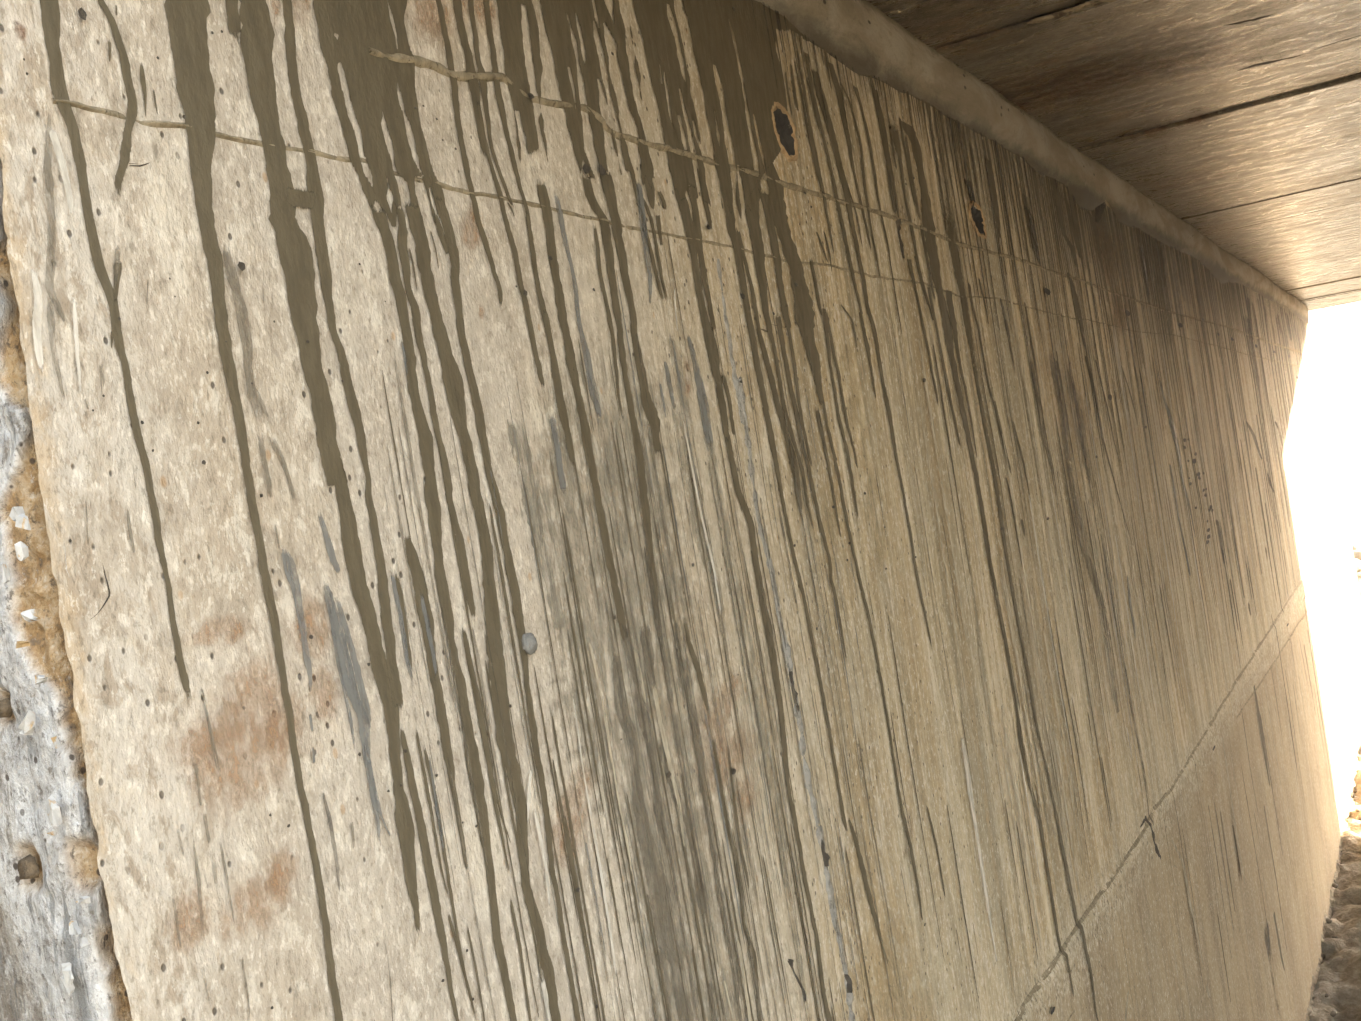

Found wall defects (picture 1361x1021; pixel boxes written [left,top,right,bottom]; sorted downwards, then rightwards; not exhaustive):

water stain [31,0,220,768]
water stain [164,0,343,1021]
water stain [225,0,491,1021]
water stain [313,0,1334,1021]
crack [896,219,905,258]
crack [1224,13,1277,26]
water stain [1189,542,1361,1002]